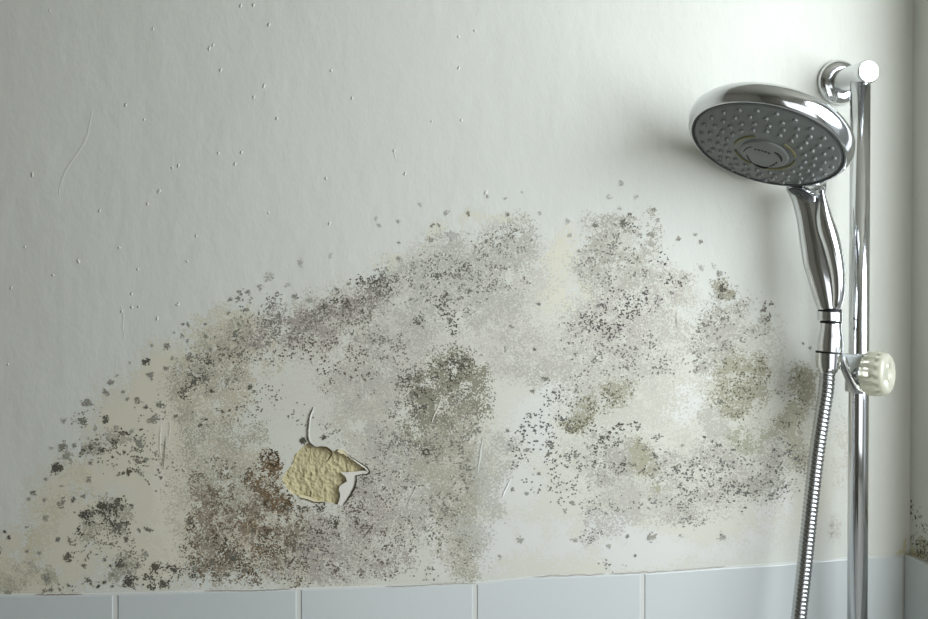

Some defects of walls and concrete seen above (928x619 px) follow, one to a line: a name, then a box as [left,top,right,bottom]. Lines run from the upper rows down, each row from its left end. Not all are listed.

spalling [283,407,369,506]
leakage [0,195,819,594]
leakage [816,398,848,543]
leakage [896,500,928,562]